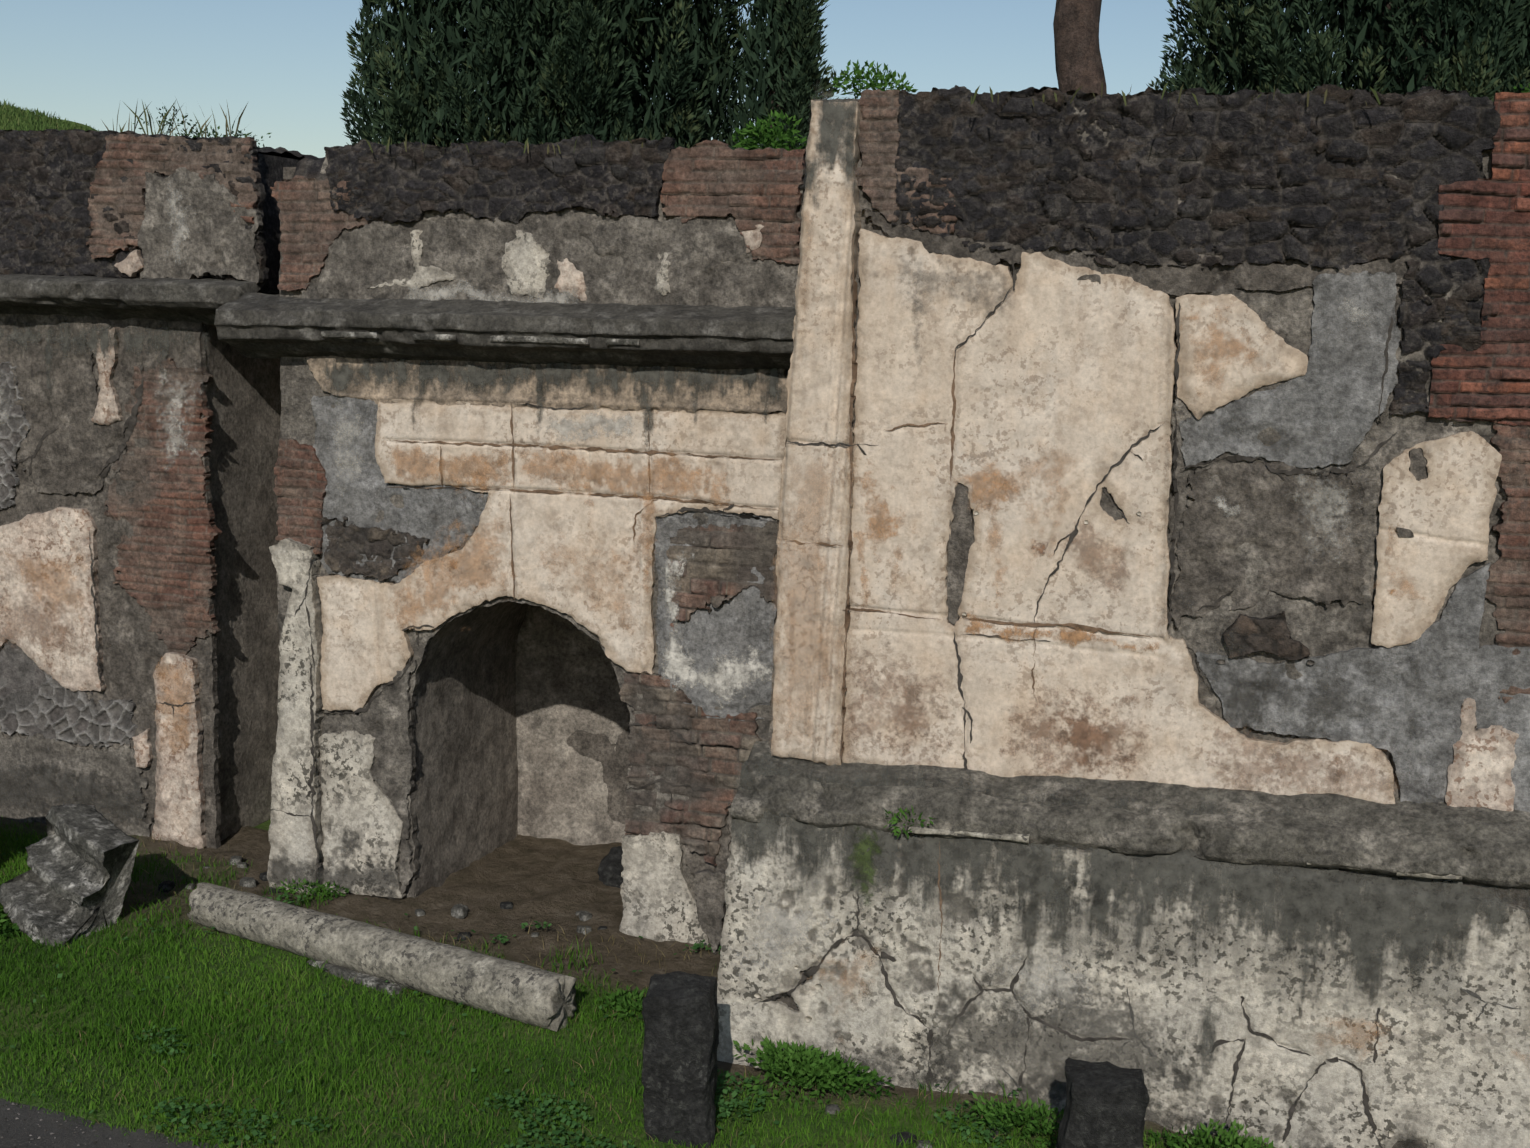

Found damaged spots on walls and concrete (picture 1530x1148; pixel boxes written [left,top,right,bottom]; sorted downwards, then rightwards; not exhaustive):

damp [325,357,782,440]
spalling [1186,272,1326,361]
spalling [1223,379,1291,406]
crack [1182,308,1397,481]
spalling [654,510,777,721]
crack [1031,426,1160,701]
crack [1199,590,1234,610]
spalling [1167,387,1380,709]
spalling [1396,527,1414,537]
crack [953,633,973,770]
damp [730,754,1530,998]
crack [1212,996,1383,1148]